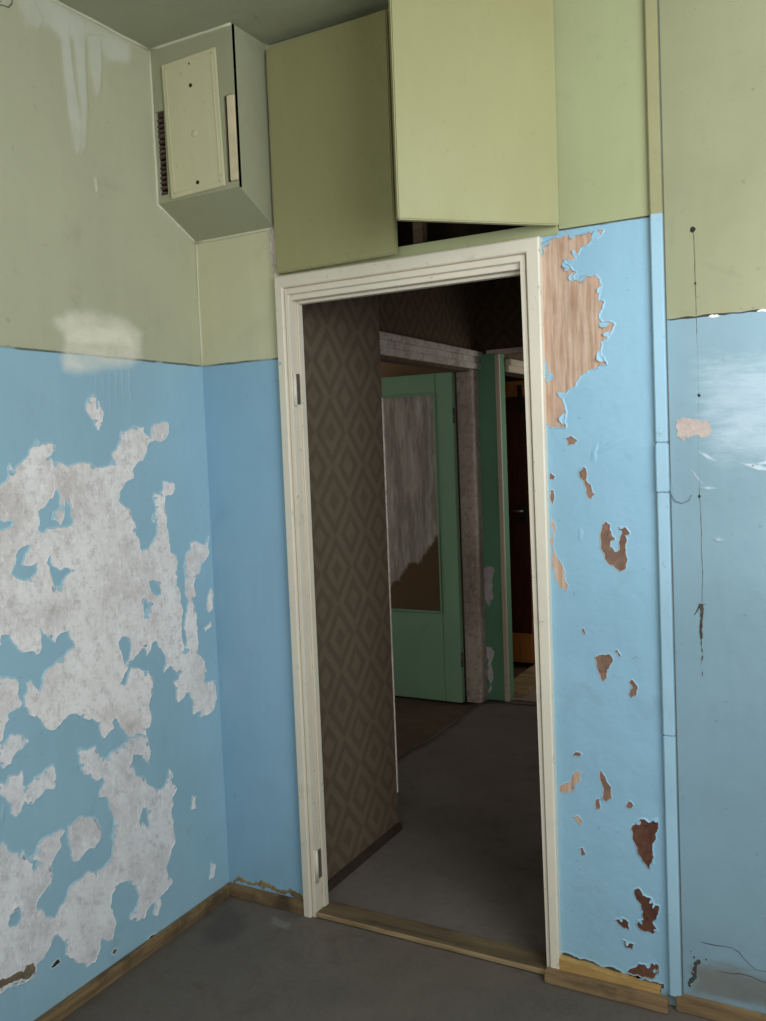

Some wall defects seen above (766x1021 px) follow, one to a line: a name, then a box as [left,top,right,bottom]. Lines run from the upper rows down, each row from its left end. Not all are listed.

leakage [0,0,139,160]
peeling [541,228,616,446]
flaking render [676,417,712,441]
peeling [578,466,596,501]
peeling [599,520,631,573]
peeling [594,649,622,683]
peeling [0,421,218,995]
peeling [594,769,613,810]
peeling [625,799,660,870]
peeling [614,887,661,951]
peeling [561,951,666,990]
crack [702,942,766,983]